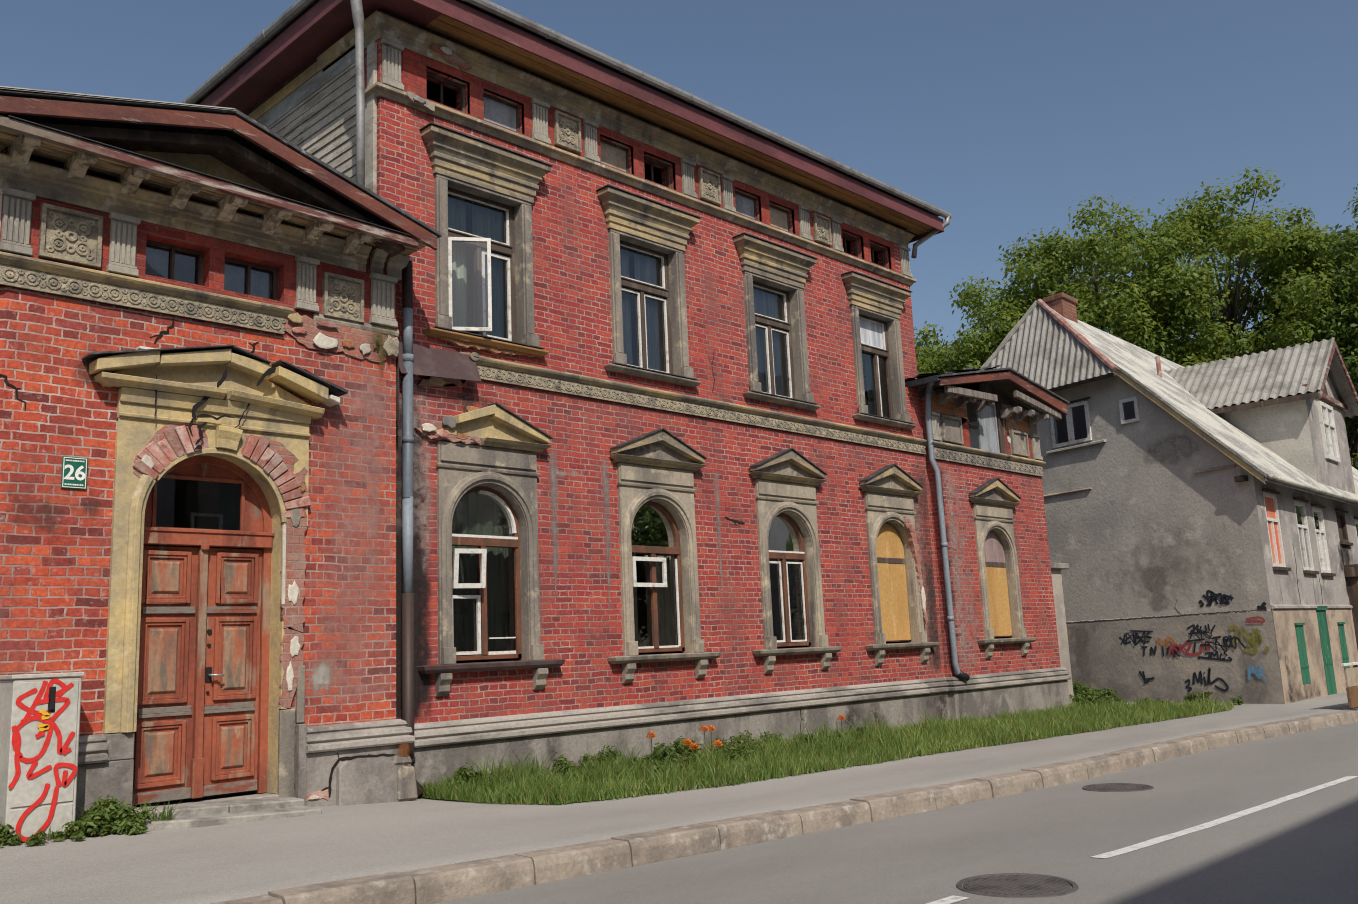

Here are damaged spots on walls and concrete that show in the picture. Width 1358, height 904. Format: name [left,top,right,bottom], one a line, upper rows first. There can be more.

crack [0,374,26,410]
crack [151,318,175,417]
crack [192,342,347,428]
spalling [284,312,399,363]
spalling [241,434,311,708]
crack [322,753,395,797]